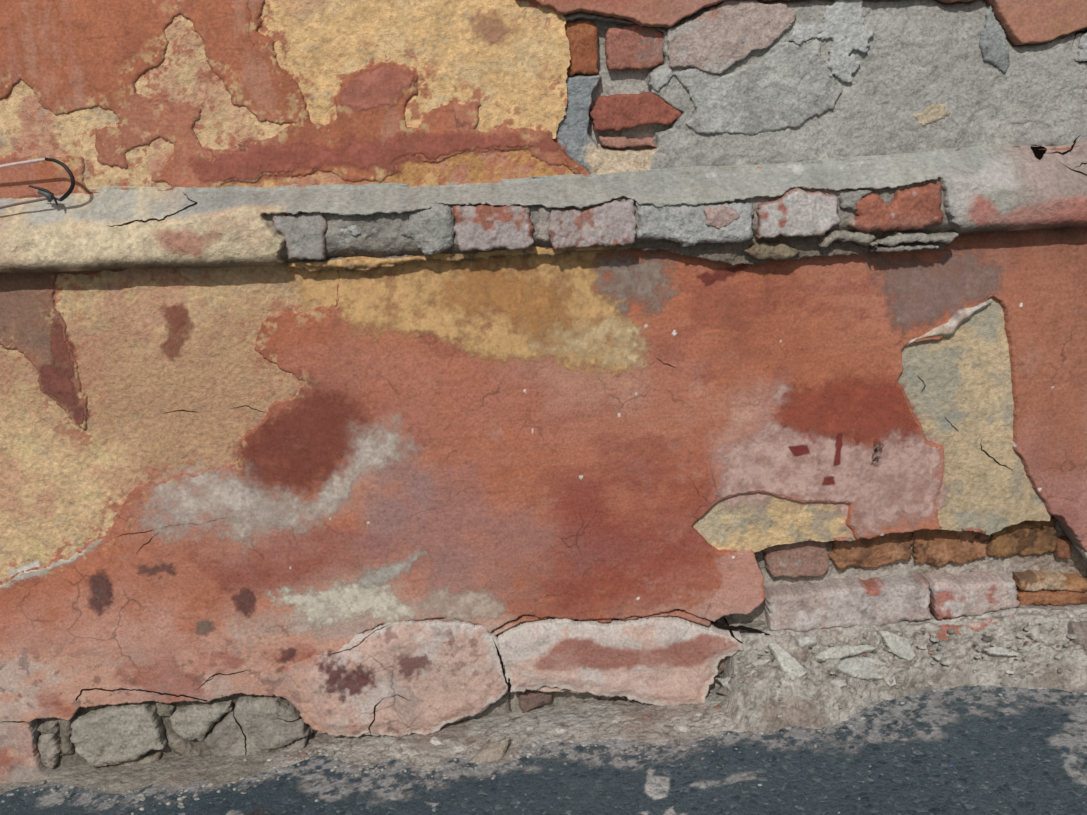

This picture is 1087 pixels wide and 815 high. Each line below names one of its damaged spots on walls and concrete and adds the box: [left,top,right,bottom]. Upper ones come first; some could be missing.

peeling [0,80,174,192]
crack [108,194,197,226]
peeling [135,14,296,150]
spalling [221,0,1087,189]
crack [1052,136,1087,175]
peeling [0,178,959,581]
leakage [142,425,412,544]
flaking render [692,297,1087,666]
crack [75,670,246,701]
flaking render [37,693,313,769]
crack [232,703,247,755]
spalling [834,657,896,687]